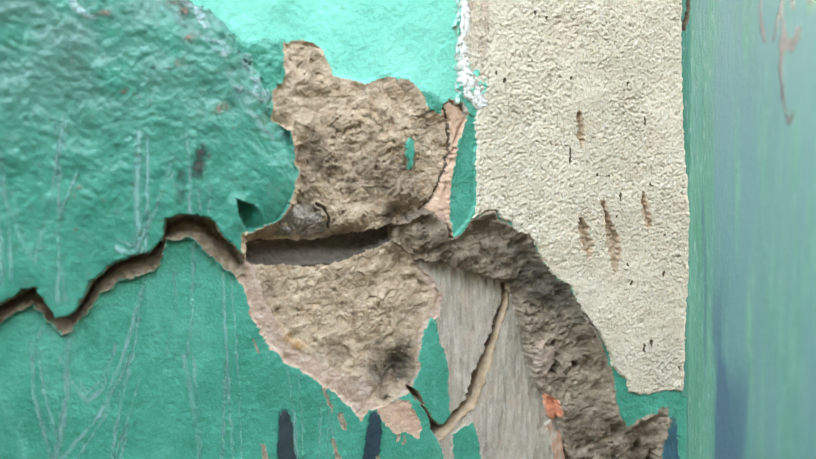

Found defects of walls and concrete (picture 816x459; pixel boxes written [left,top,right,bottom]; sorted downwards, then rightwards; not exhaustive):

crack [0,107,451,335]
flaking render [237,39,673,459]
crack [405,282,511,459]